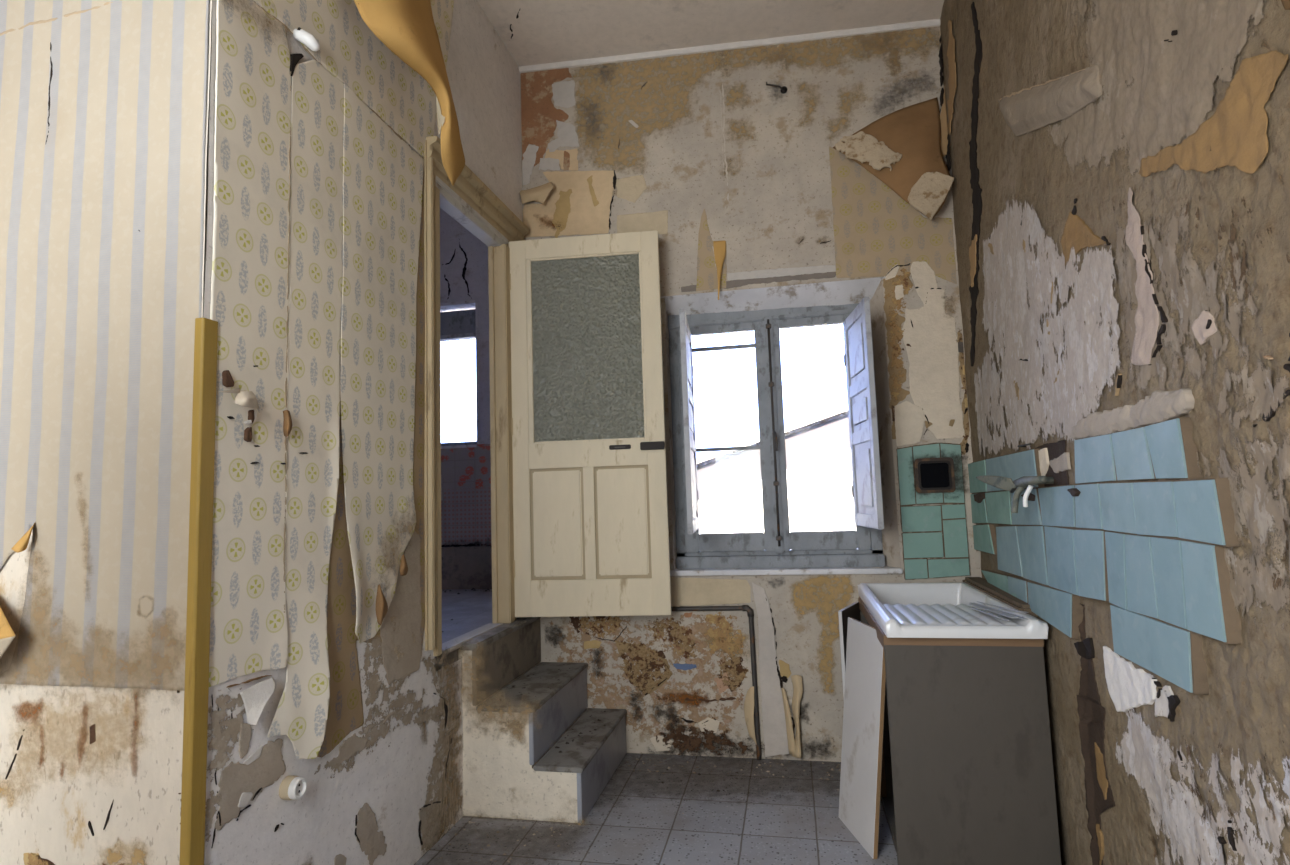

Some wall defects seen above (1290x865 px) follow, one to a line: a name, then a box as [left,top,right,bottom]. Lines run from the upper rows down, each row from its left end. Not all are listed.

flaking render [520,68,579,204]
peeling [833,36,954,219]
crack [442,239,472,299]
flaking render [883,264,932,446]
peeling [949,187,1272,501]
flaking render [205,678,286,842]
flaking render [355,803,387,865]
flaking render [314,529,463,852]
leakage [546,625,565,646]
leakage [630,694,762,757]
leakage [805,743,830,757]
flaking render [1074,603,1290,865]